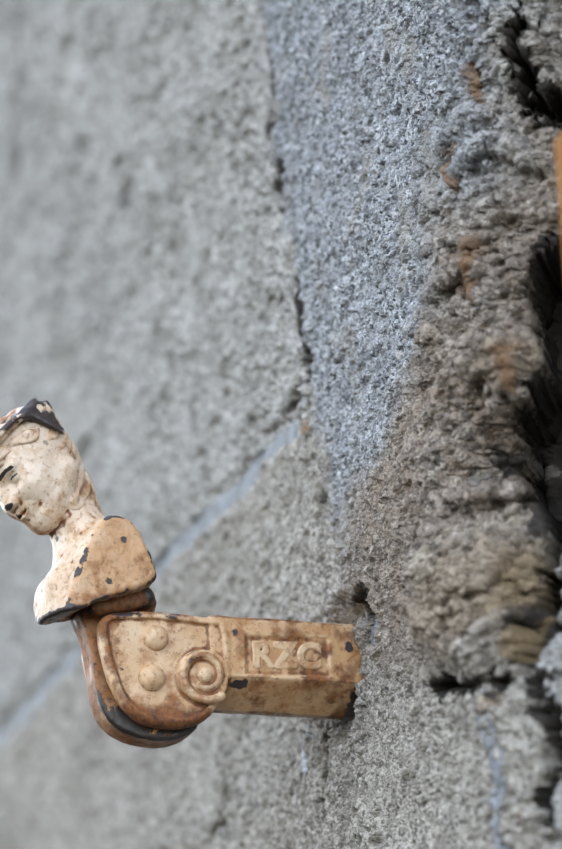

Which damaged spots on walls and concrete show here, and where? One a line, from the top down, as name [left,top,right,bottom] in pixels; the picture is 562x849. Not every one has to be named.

rust [466,63,484,105]
rust [439,149,460,192]
spalling [463,449,562,485]
spalling [352,581,379,643]